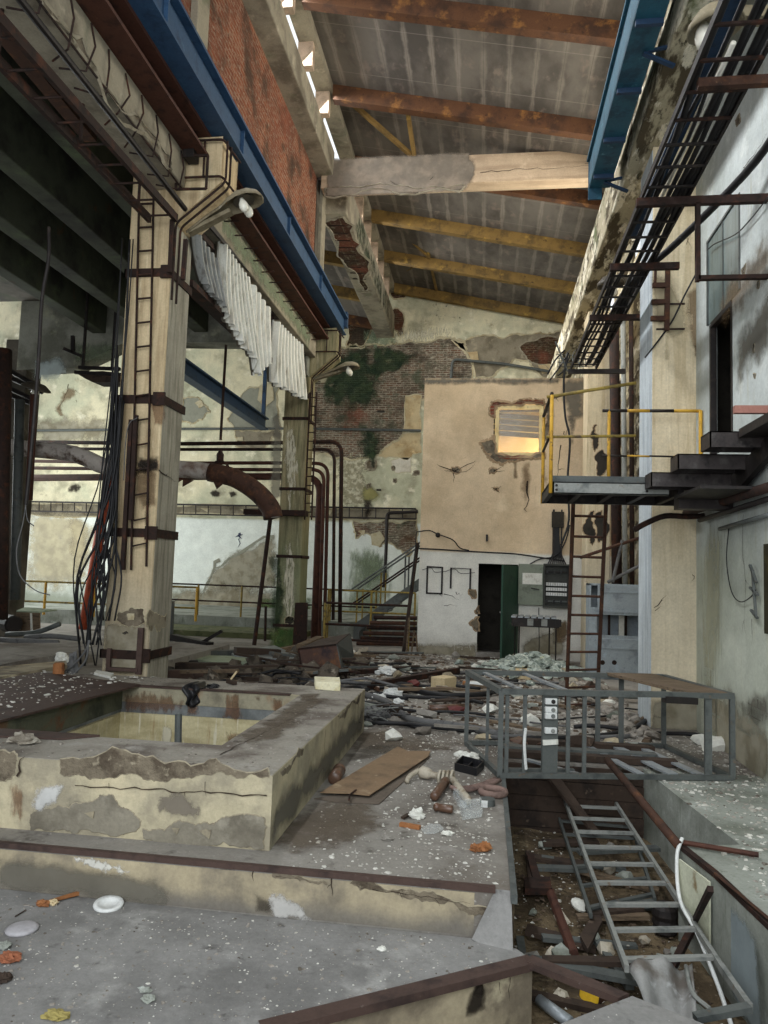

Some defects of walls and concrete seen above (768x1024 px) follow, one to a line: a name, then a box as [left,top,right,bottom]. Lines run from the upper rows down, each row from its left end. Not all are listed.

spalling [326,216,371,291]
leakage [654,278,696,349]
flaking render [312,292,561,489]
crack [437,461,501,492]
flaking render [329,508,419,557]
spalling [116,606,167,635]
flaking render [0,682,361,782]
crack [75,785,267,797]
flaking render [29,794,267,850]
crack [372,889,470,906]